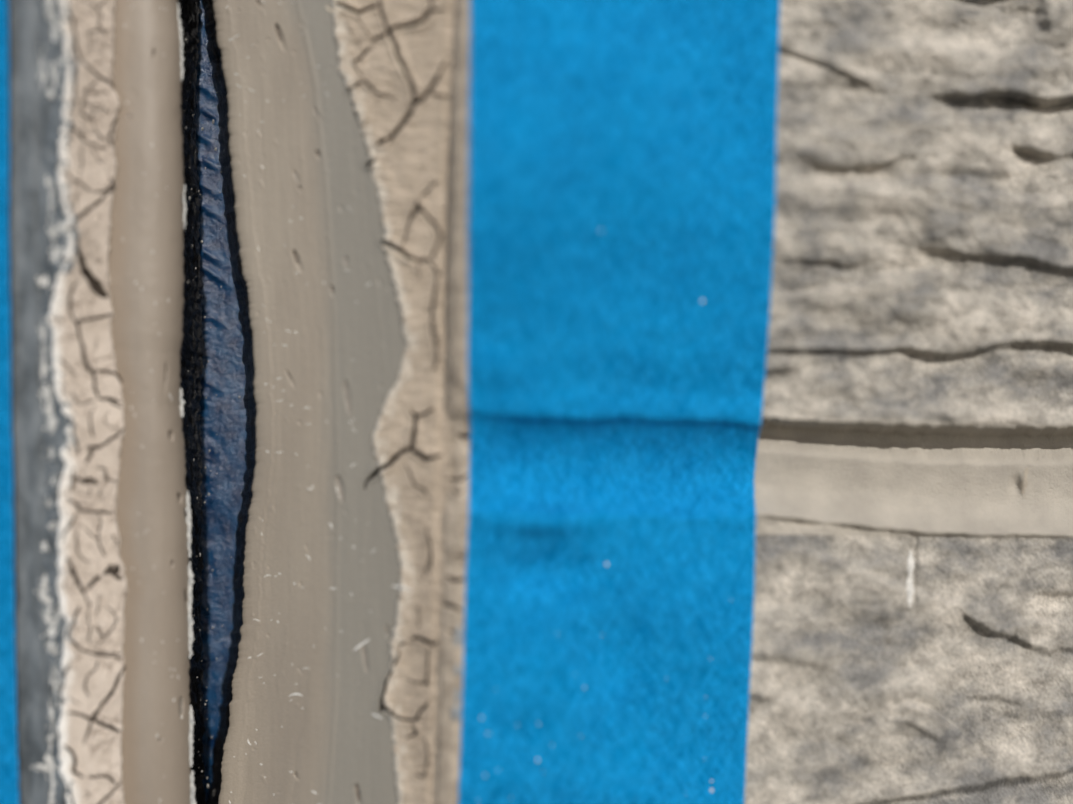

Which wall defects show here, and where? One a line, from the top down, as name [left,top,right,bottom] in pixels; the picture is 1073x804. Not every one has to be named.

crack [47,0,128,804]
crack [326,0,469,804]